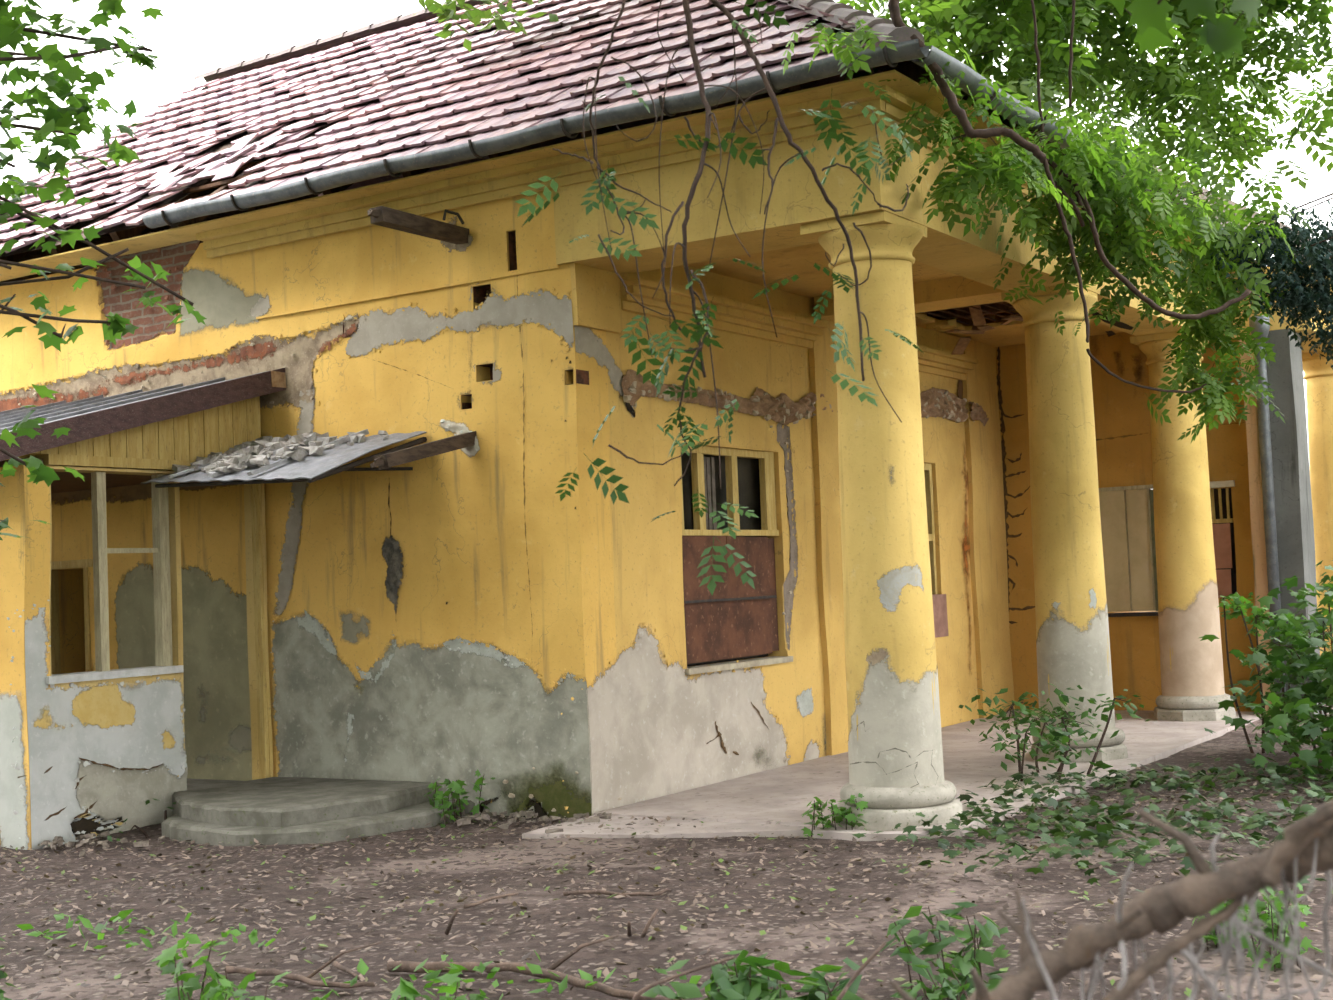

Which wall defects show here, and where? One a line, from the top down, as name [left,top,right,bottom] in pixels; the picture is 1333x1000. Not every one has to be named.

flaking render [0,226,360,435]
flaking render [440,361,502,457]
spalling [469,283,495,304]
spalling [551,357,589,385]
peeling [7,600,188,850]
flaking render [269,482,822,818]
flaking render [848,648,944,788]
flaking render [1036,588,1115,732]
flaking render [1158,581,1225,696]